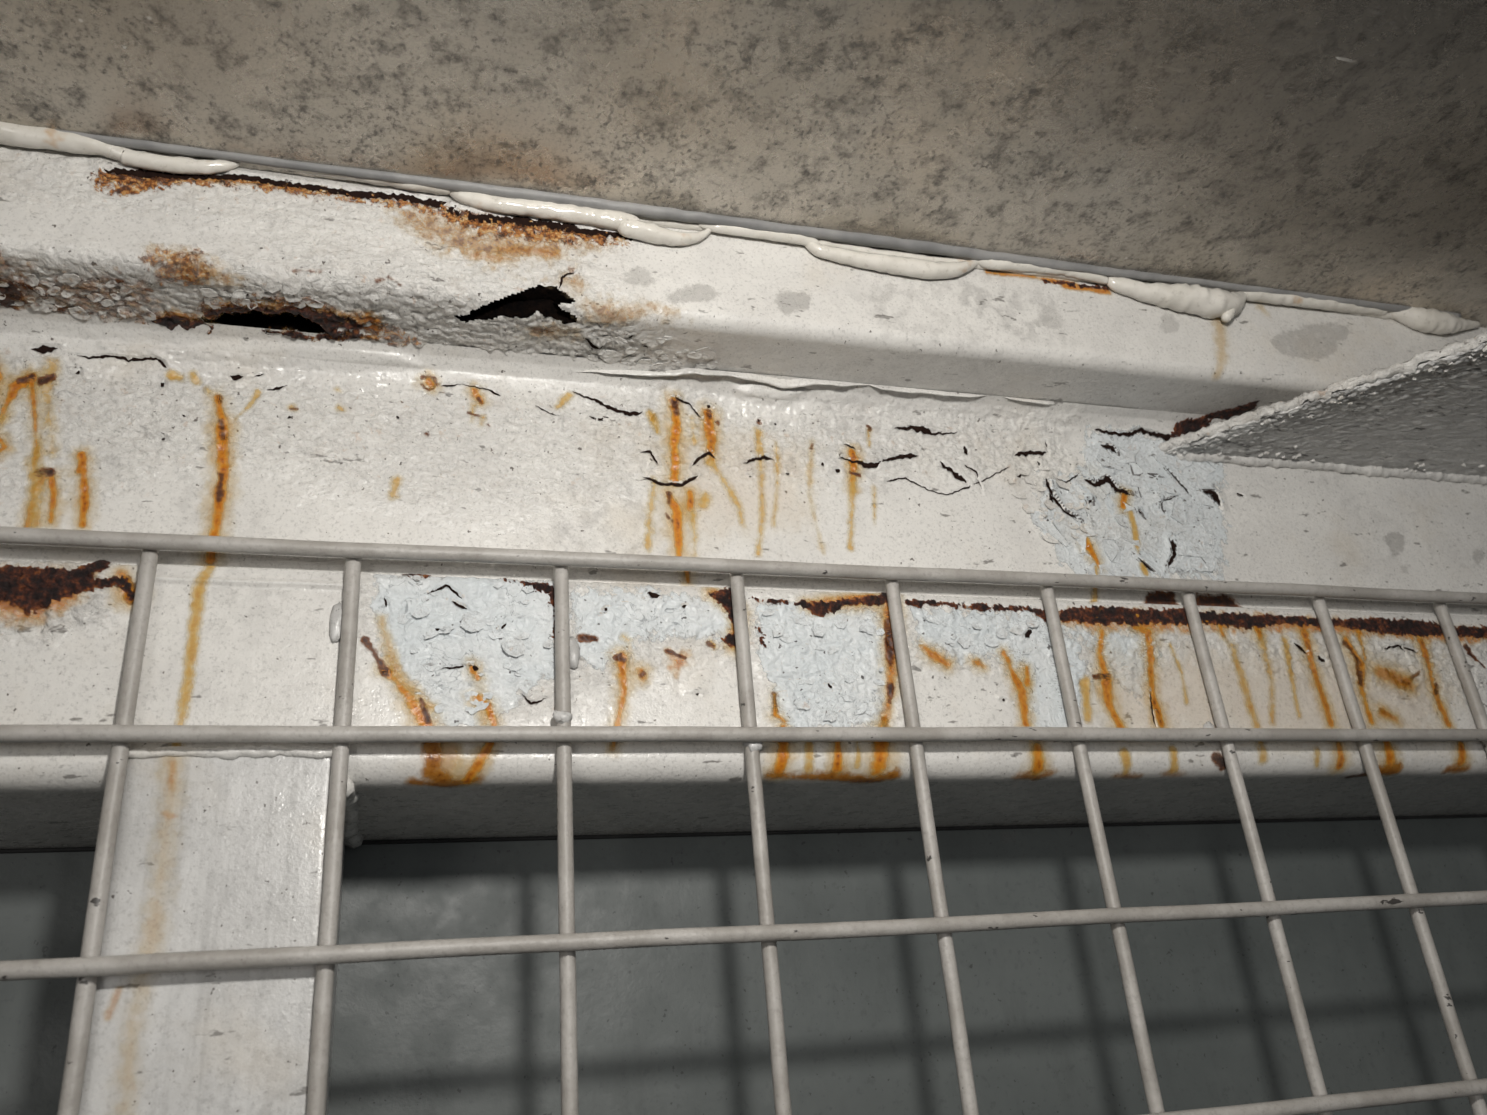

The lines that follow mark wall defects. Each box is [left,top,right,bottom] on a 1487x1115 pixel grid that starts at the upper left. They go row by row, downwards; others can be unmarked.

corrosion [90,167,633,260]
spalling [199,275,373,340]
spalling [454,285,577,324]
peeling [577,335,987,397]
corrosion [1171,400,1260,438]
corrosion [646,397,743,583]
crack [840,425,1243,573]
peeling [1007,425,1232,581]
corrosion [360,636,497,788]
peeling [370,574,733,726]
peeling [755,602,889,727]
corrosion [765,692,900,783]